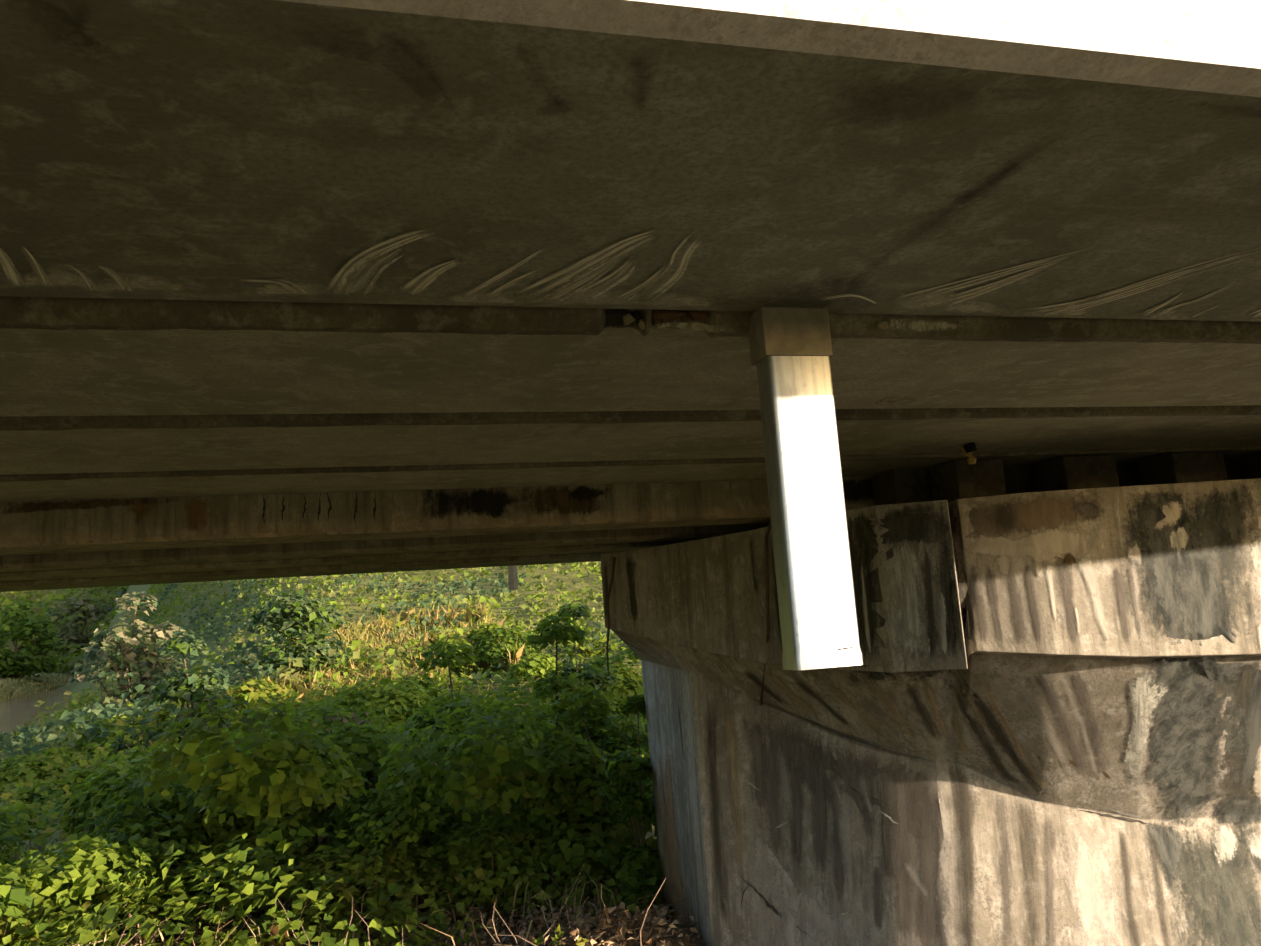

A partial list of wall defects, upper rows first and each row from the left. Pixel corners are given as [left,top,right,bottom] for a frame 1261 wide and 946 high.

spalling [604,309,731,332]
damp [843,478,1140,657]
damp [908,682,1044,790]
damp [1016,674,1106,775]
damp [1131,676,1149,755]
damp [1235,665,1261,789]
damp [707,674,974,946]
damp [997,800,1055,946]
damp [1121,835,1139,946]